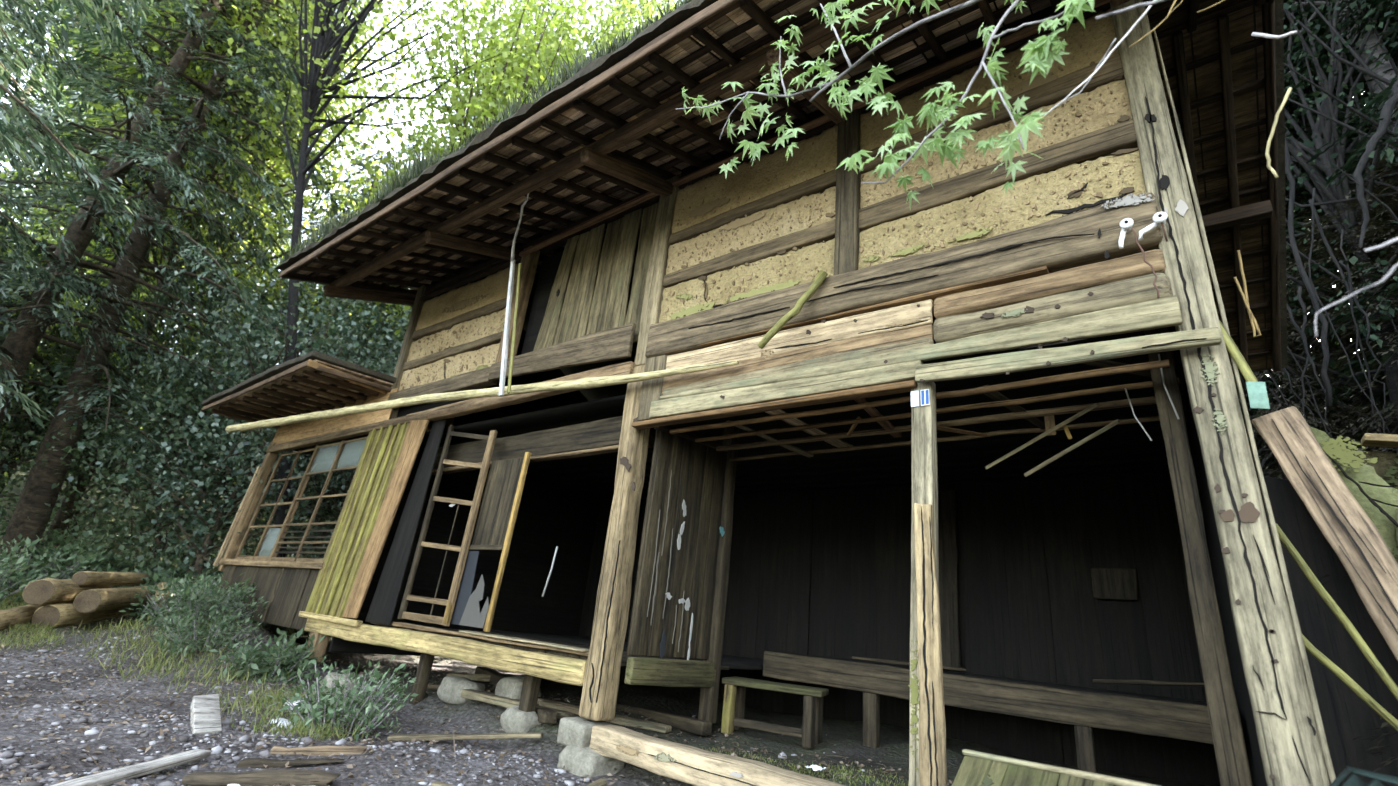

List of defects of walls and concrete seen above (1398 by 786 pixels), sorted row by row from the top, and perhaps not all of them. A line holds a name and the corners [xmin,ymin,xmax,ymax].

spalling [861,77,1129,202]
spalling [860,148,1139,266]
crack [684,96,1316,786]
peeling [677,499,686,550]
peeling [665,593,693,660]